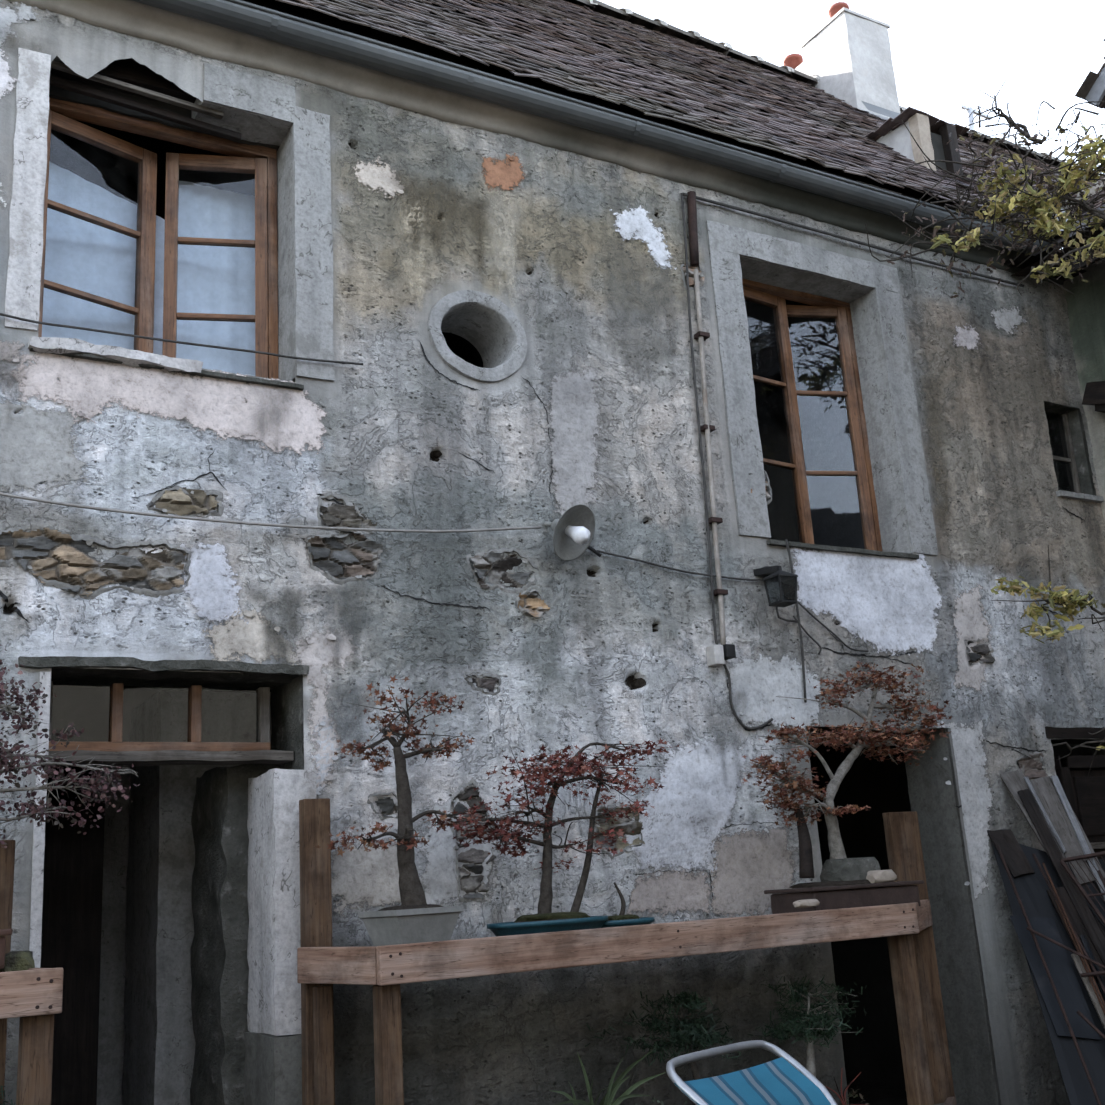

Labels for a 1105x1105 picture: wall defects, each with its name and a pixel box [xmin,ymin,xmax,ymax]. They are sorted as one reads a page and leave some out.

peeling [0,2,49,99]
peeling [481,153,525,193]
peeling [610,205,704,291]
peeling [0,340,327,455]
spalling [0,526,359,795]
spalling [306,492,383,584]
spalling [466,547,550,617]
peeling [790,547,995,694]
spalling [449,778,496,903]